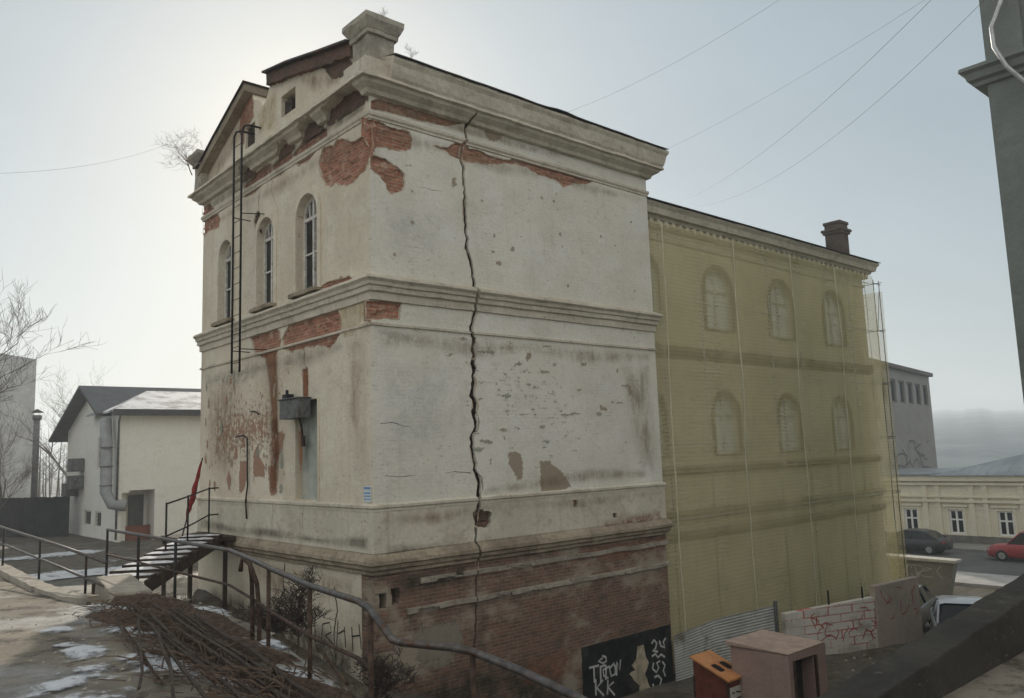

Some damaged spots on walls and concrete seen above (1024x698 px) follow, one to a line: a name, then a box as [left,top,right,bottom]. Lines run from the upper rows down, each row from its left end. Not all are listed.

flaking render [244,98,459,198]
flaking render [432,141,593,188]
flaking render [250,311,341,359]
flaking render [364,299,402,322]
crack [448,123,482,531]
peeling [204,371,285,496]
peeling [473,353,581,491]
flaking render [473,507,489,527]